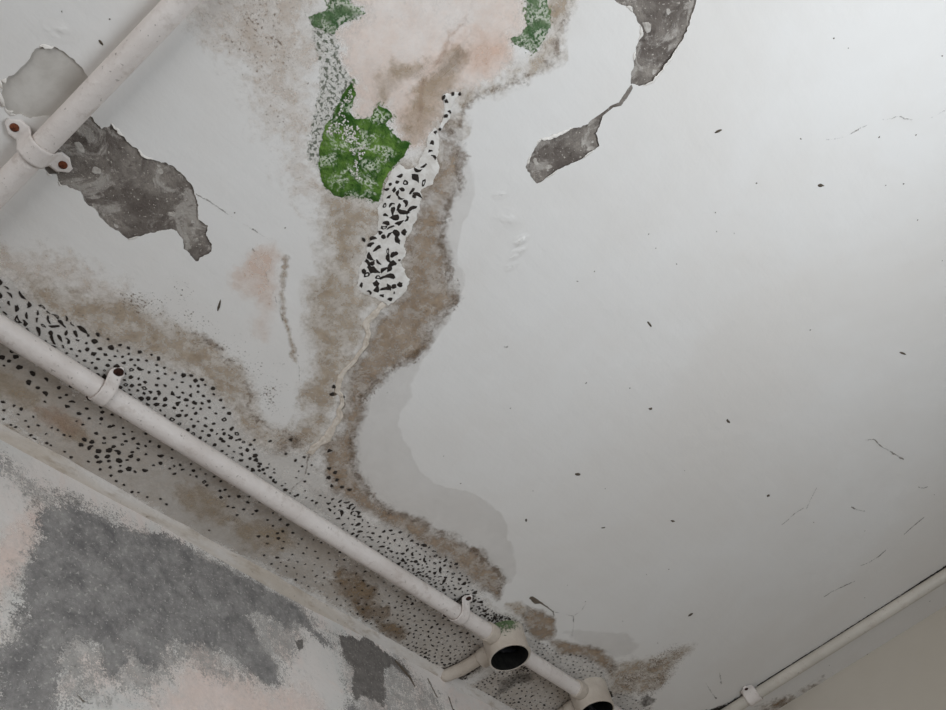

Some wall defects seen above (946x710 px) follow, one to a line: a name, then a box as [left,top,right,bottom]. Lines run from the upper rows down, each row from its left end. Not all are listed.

spalling [0,44,88,118]
spalling [526,0,696,183]
spalling [44,115,212,261]
leakage [0,28,687,710]